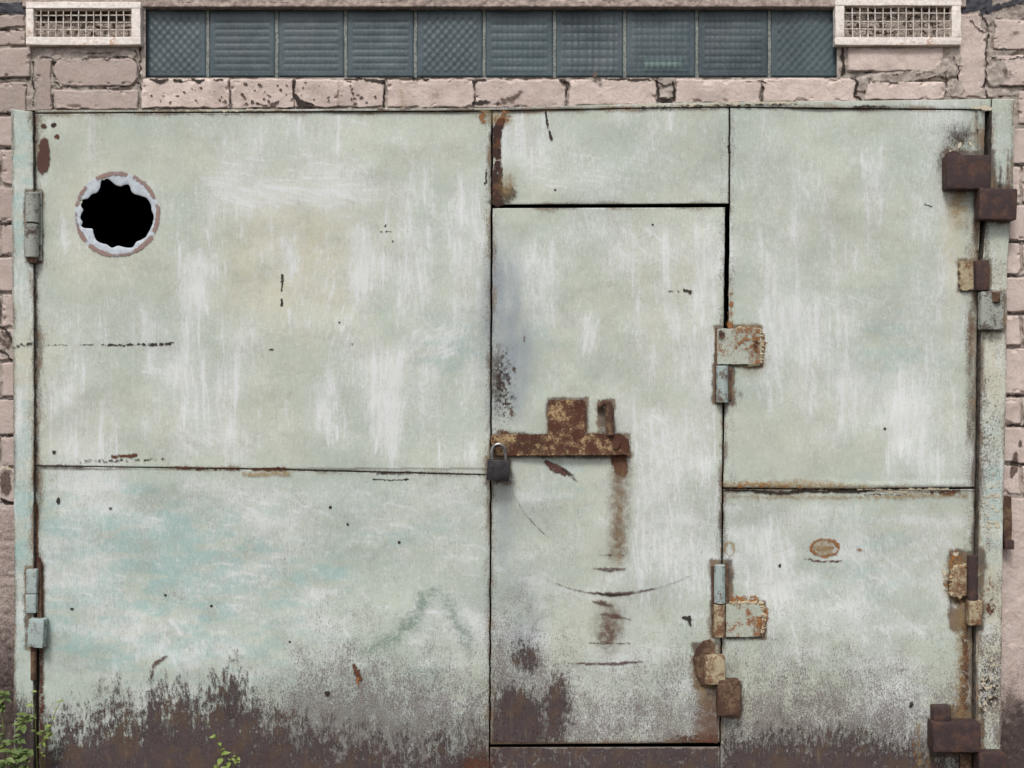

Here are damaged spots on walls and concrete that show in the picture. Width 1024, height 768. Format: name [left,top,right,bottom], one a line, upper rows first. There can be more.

rust [37,122,59,174]
rust [478,110,515,207]
rust [719,278,767,367]
rust [491,358,516,417]
rust [611,455,628,554]
rust [724,481,966,499]
rust [805,538,842,562]
rust [942,551,962,587]